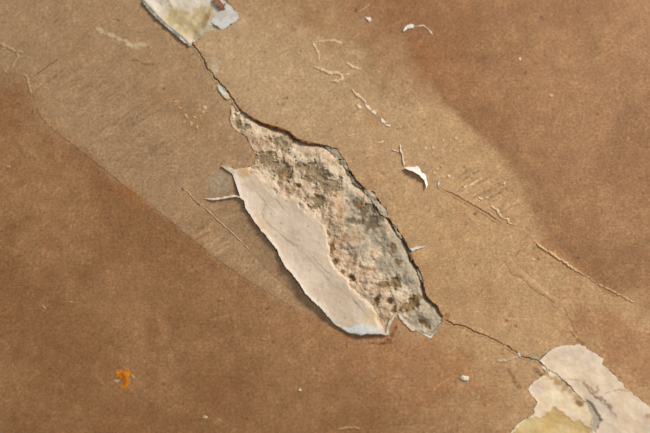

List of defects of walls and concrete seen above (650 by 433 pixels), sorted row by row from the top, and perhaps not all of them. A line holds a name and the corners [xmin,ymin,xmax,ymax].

peeling [142,0,239,47]
crack [191,41,241,112]
peeling [351,88,391,127]
spalling [201,105,443,339]
crack [440,318,540,364]
rust [114,368,135,389]
peeling [510,344,650,433]